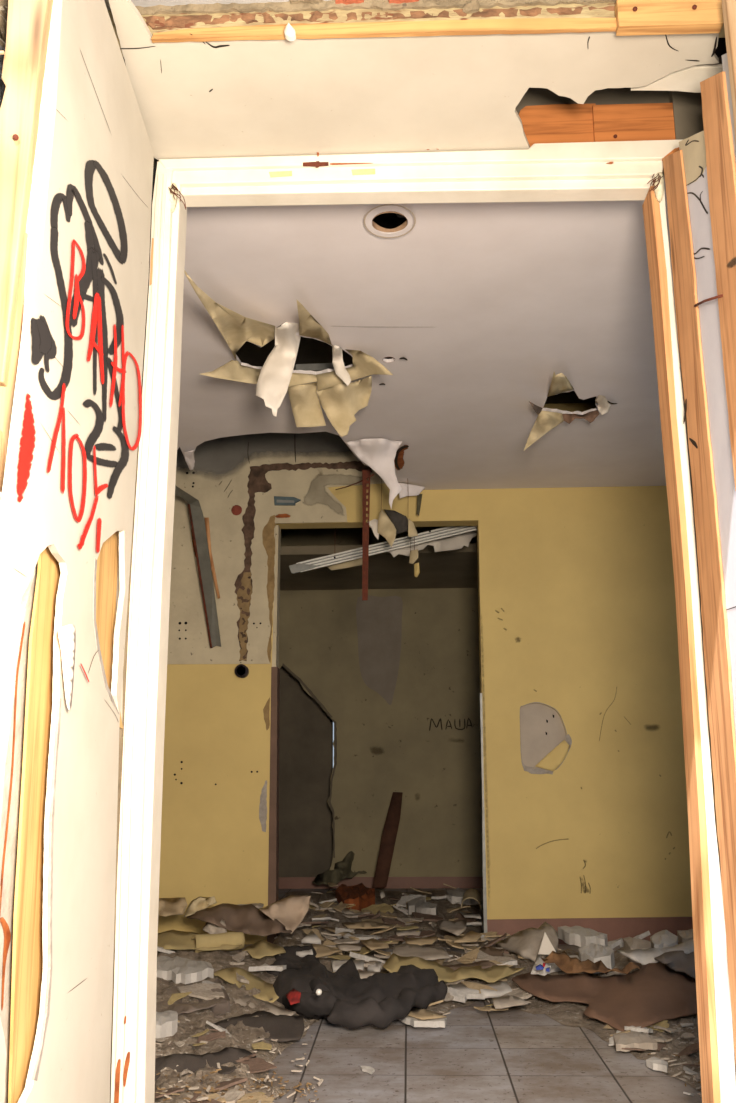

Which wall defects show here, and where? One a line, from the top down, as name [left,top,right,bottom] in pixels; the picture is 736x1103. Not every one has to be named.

spalling [32,624,76,1081]
spalling [520,702,572,775]